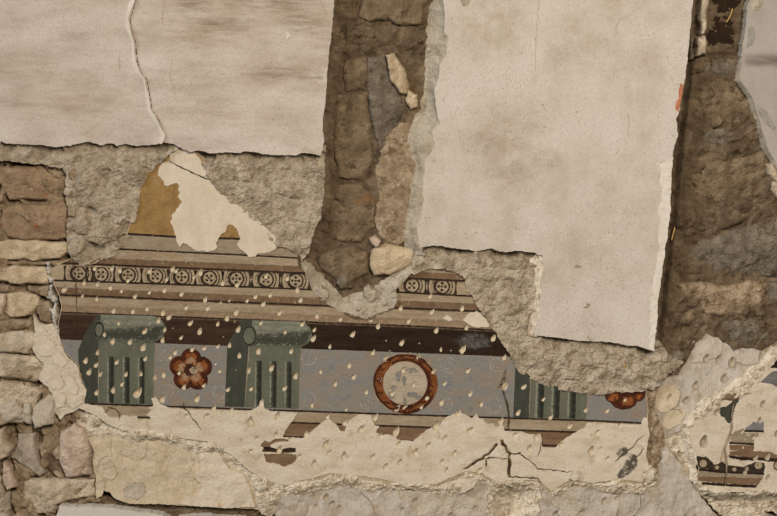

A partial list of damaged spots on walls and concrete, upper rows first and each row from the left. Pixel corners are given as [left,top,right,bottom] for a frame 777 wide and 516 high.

crack [119,0,165,144]
spalling [404,0,448,258]
spalling [734,0,777,171]
peeling [0,141,777,516]
crack [465,373,565,483]
crack [720,400,735,486]